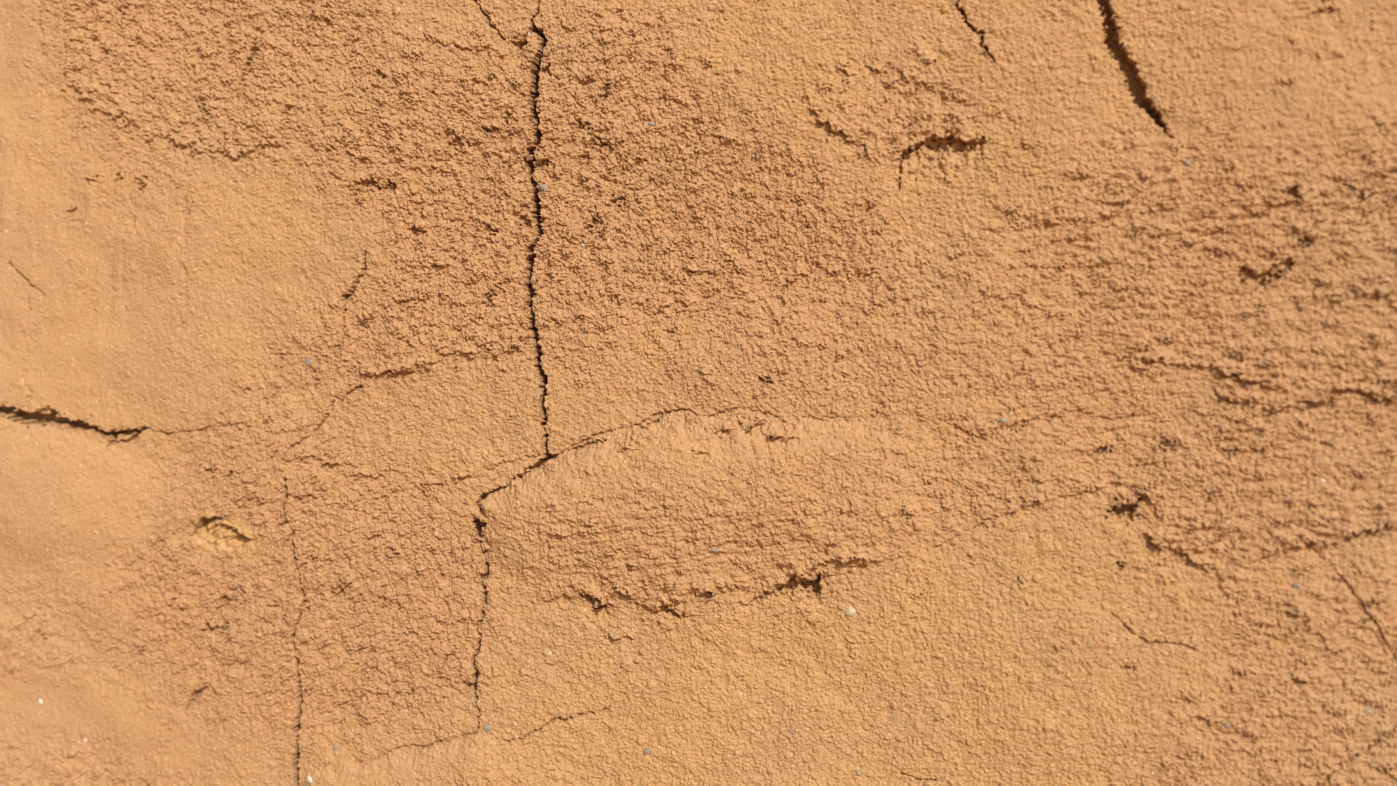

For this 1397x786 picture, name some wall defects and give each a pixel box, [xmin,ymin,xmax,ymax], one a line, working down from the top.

crack [1095,0,1177,140]
crack [0,403,245,448]
crack [275,248,368,786]
crack [367,0,1155,763]